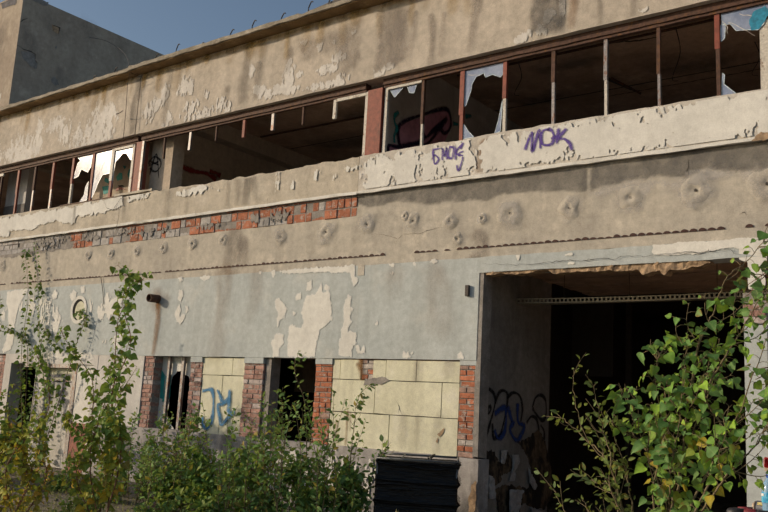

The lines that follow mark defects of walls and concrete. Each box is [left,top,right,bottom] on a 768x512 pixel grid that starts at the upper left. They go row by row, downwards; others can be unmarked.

peeling [142,72,231,127]
peeling [0,89,768,258]
spalling [484,237,768,277]
peeling [0,288,61,353]
peeling [69,286,124,320]
peeling [259,264,374,379]
peeling [44,351,95,361]
peeling [486,449,512,485]